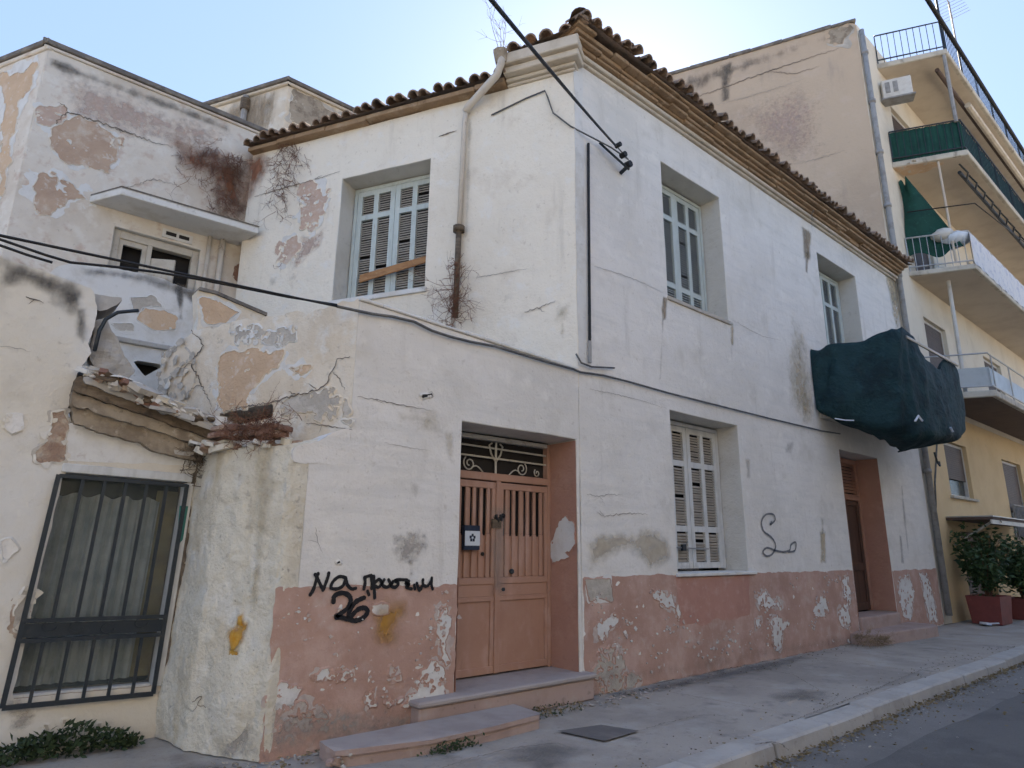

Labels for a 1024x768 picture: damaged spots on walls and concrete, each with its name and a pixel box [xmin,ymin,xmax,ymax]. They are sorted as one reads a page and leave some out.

peeling [0,55,125,219]
peeling [274,177,332,270]
peeling [98,290,197,407]
peeling [197,296,355,427]
crack [179,330,426,414]
spalling [31,408,71,468]
peeling [550,515,577,565]
water stain [594,536,667,563]
peeling [261,590,462,734]
peeling [584,574,790,694]
peeling [808,573,854,643]
peeling [897,571,938,624]